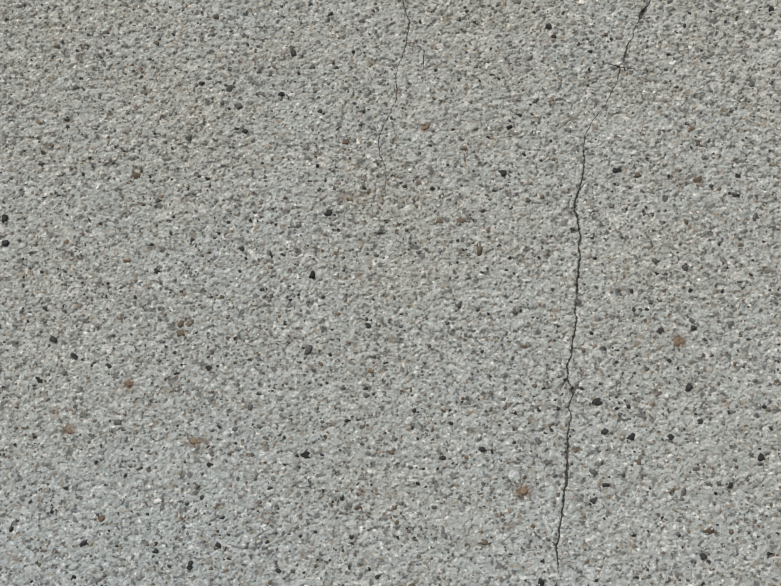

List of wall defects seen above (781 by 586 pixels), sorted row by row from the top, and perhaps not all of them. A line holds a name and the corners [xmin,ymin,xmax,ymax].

crack [555,1,650,586]